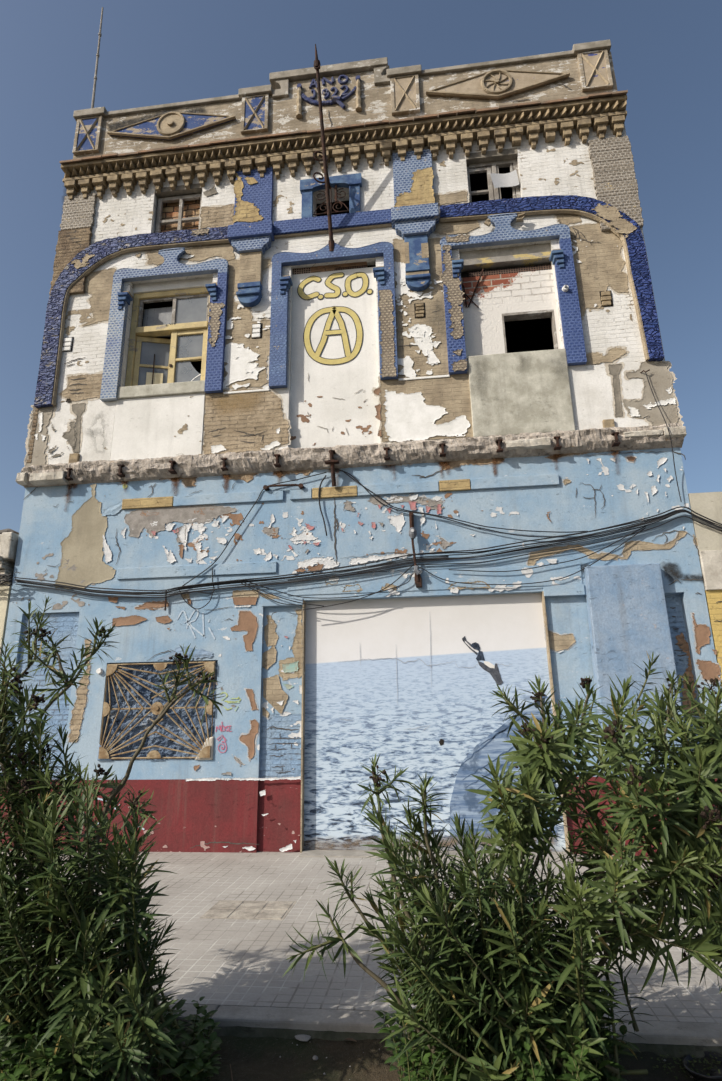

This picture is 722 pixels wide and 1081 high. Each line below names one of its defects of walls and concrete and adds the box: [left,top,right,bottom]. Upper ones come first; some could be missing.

peeling [180,173,322,455]
peeling [341,161,481,443]
peeling [24,361,103,467]
peeling [584,346,684,426]
rust [263,471,304,491]
crack [576,483,605,516]
crack [584,450,686,460]
peeling [35,553,96,610]
peeling [102,535,112,563]
peeling [121,493,698,597]
peeling [186,589,305,796]